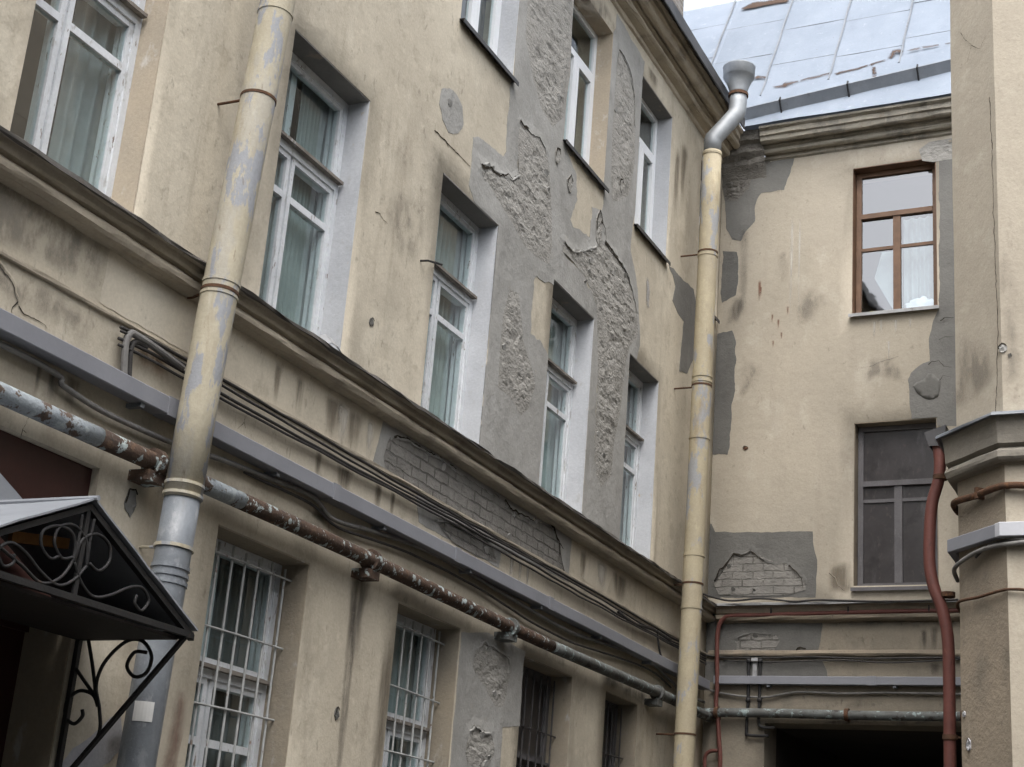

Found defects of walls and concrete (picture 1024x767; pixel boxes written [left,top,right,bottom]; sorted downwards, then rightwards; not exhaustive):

rust [742,0,788,9]
spalling [526,0,572,127]
rust [755,43,949,88]
spalling [611,49,636,201]
spalling [722,176,751,201]
crack [0,261,45,325]
spalling [481,121,638,486]
spalling [384,433,563,569]
spalling [713,550,806,596]
spalling [473,640,511,707]
spalling [466,724,494,767]